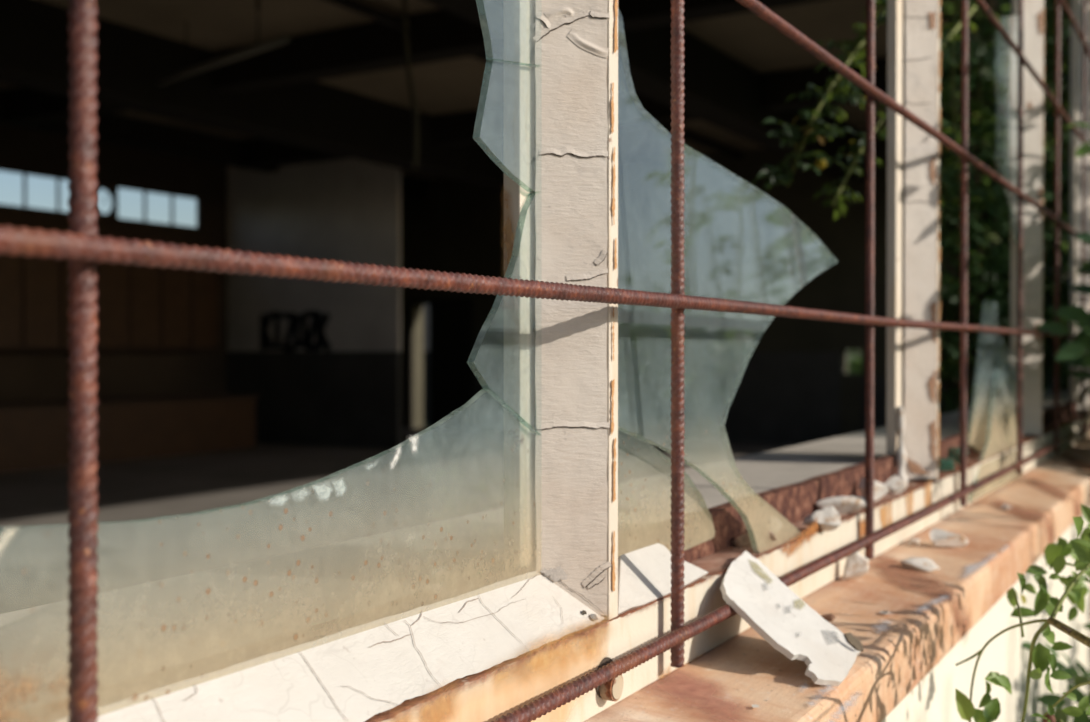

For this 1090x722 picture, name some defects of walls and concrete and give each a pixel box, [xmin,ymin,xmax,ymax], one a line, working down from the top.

crack [533,10,610,42]
crack [539,148,608,158]
crack [566,249,608,281]
rust [692,520,821,574]
rust [840,509,865,539]
crack [370,561,612,688]
crack [299,651,399,720]
rust [404,622,608,722]